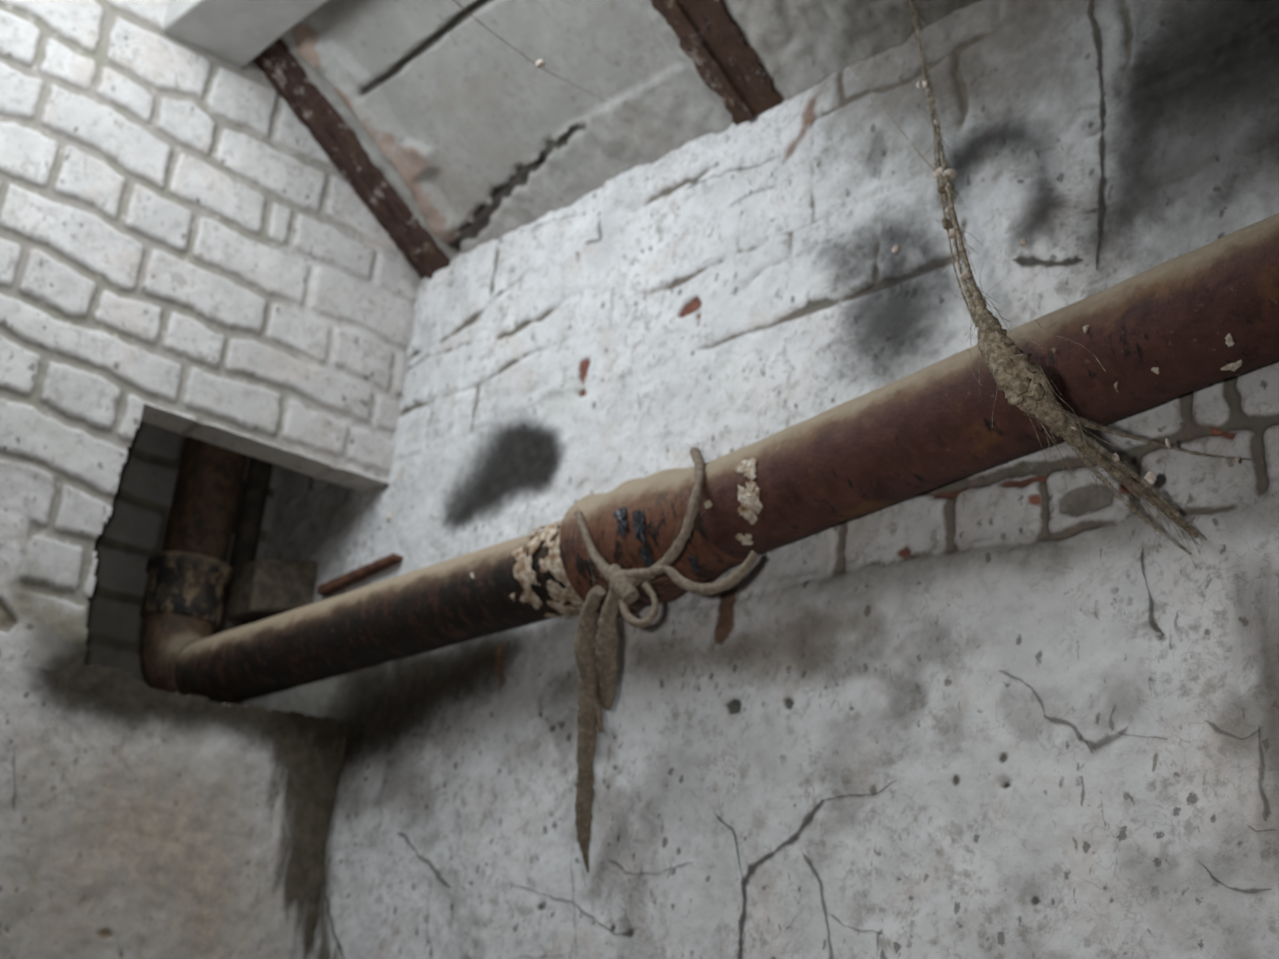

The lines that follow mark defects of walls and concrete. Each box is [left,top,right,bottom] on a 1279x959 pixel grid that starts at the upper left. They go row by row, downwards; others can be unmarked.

crack [1012,0,1105,270]
peeling [0,601,16,632]
damp [39,632,517,959]
crack [715,780,897,959]